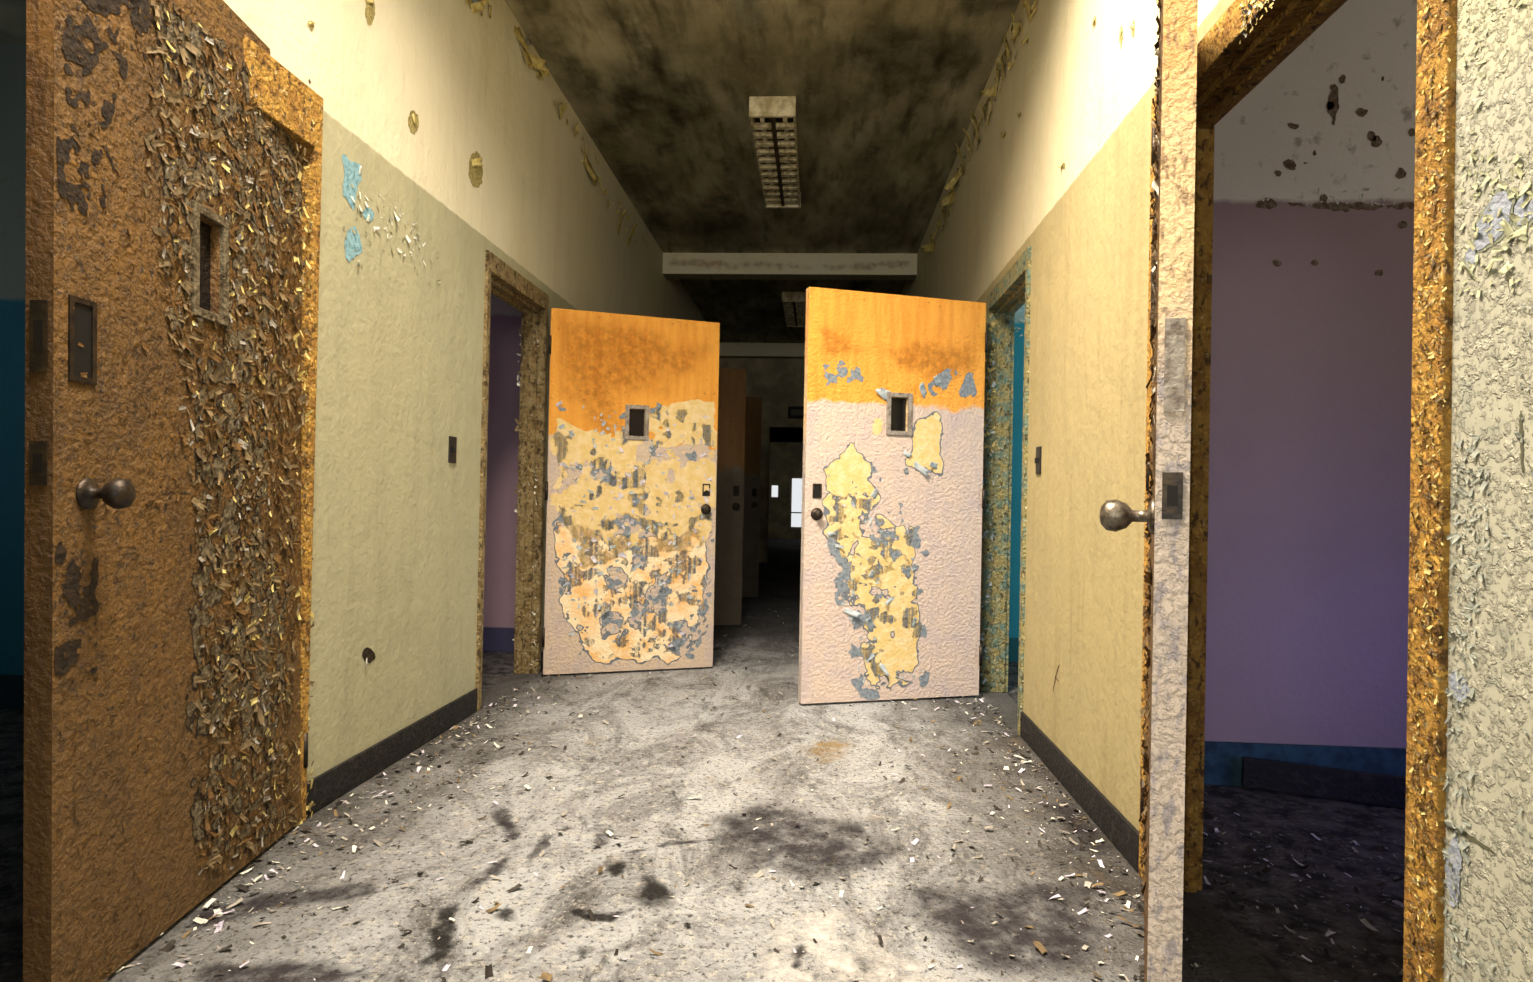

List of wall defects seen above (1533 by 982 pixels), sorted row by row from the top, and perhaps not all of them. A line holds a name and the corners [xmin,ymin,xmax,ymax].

peeling [365,0,375,26]
peeling [1119,20,1135,48]
peeling [342,154,441,285]
peeling [408,110,419,134]
peeling [468,151,484,188]
peeling [921,0,1038,253]
peeling [55,0,315,949]
peeling [512,399,717,669]
peeling [823,360,891,402]
peeling [822,442,930,700]
peeling [902,313,1000,477]
peeling [979,475,999,684]